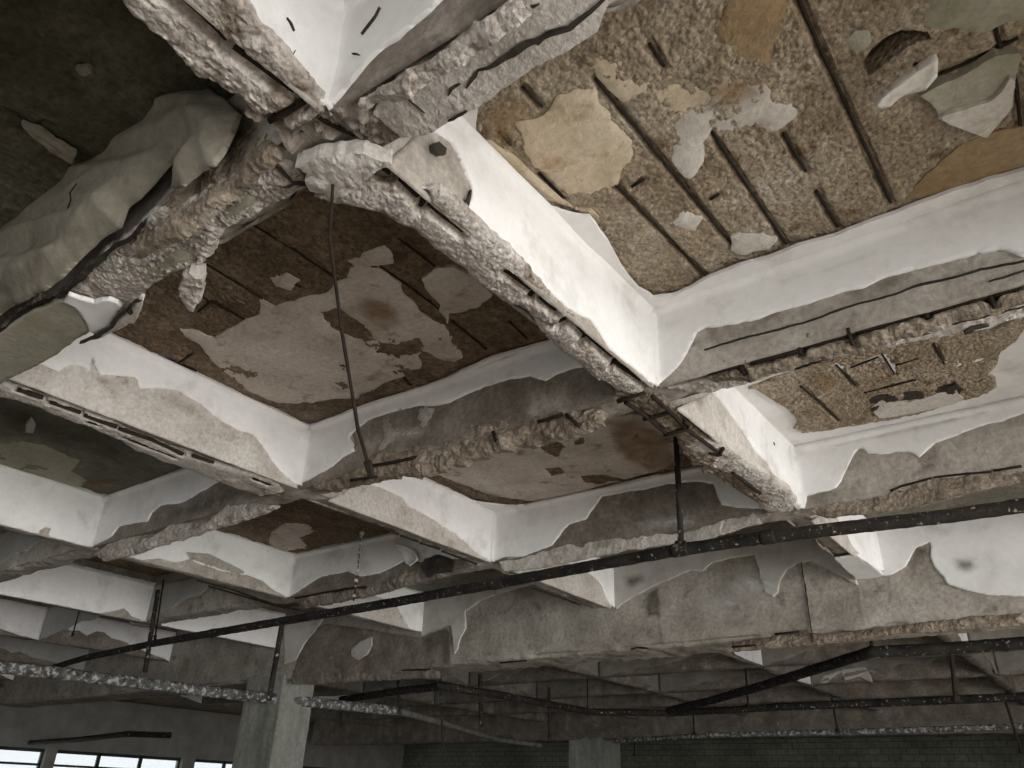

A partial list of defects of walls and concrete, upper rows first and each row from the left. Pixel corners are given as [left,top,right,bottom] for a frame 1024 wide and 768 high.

peeling [0,0,1024,609]